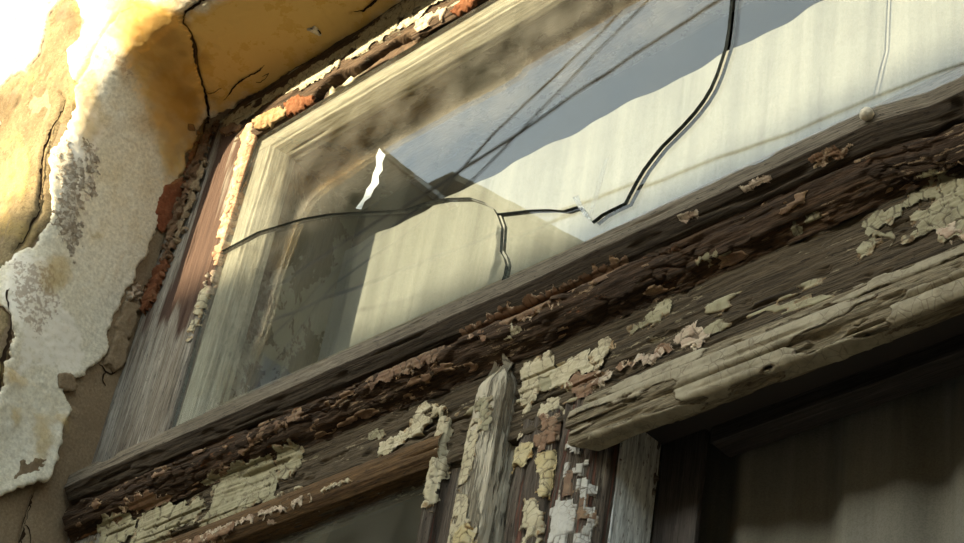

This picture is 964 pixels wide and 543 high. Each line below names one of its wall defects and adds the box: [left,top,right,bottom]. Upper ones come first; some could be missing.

crack [13,97,66,253]
spalling [0,0,101,268]
crack [182,0,269,158]
peeling [102,0,480,373]
crack [354,0,377,12]
peeling [854,166,964,261]
peeling [84,407,352,543]
peeling [365,345,451,390]
peeling [368,395,494,543]
peeling [459,255,629,342]
peeling [511,320,712,543]
peeling [626,298,672,336]